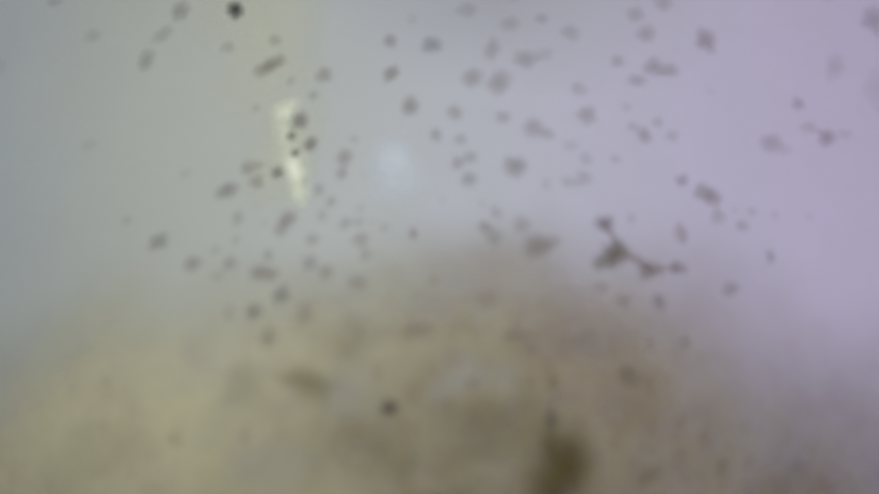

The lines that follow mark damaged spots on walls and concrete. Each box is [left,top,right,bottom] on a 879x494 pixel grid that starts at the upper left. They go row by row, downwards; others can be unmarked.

water stain [285,151,304,195]
water stain [0,302,879,494]